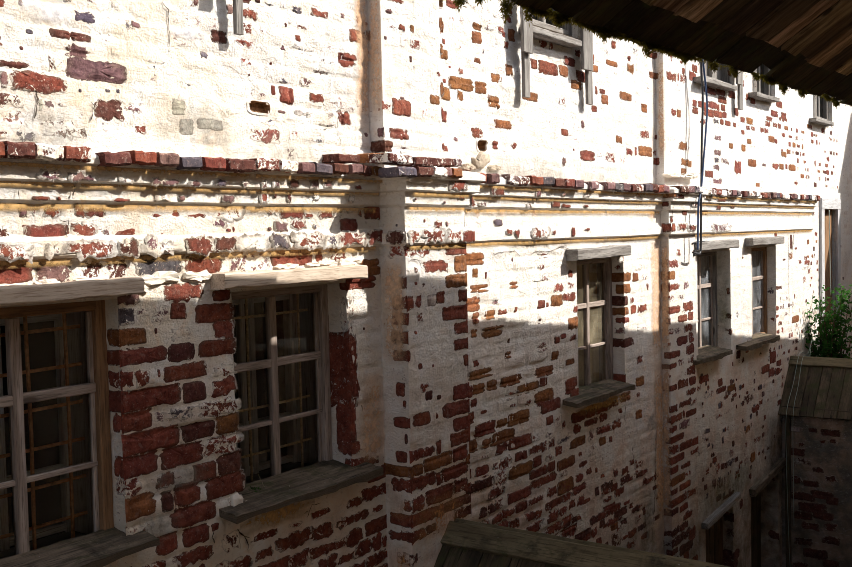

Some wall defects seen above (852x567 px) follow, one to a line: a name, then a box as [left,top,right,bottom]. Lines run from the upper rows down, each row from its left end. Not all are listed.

peeling [175,0,329,76]
peeling [0,0,142,142]
peeling [530,39,638,91]
peeling [647,56,698,89]
peeling [172,98,223,135]
peeling [591,86,608,112]
peeling [619,91,647,113]
peeling [573,130,660,165]
peeling [668,141,692,174]
peeling [692,86,838,189]
peeling [36,169,97,183]